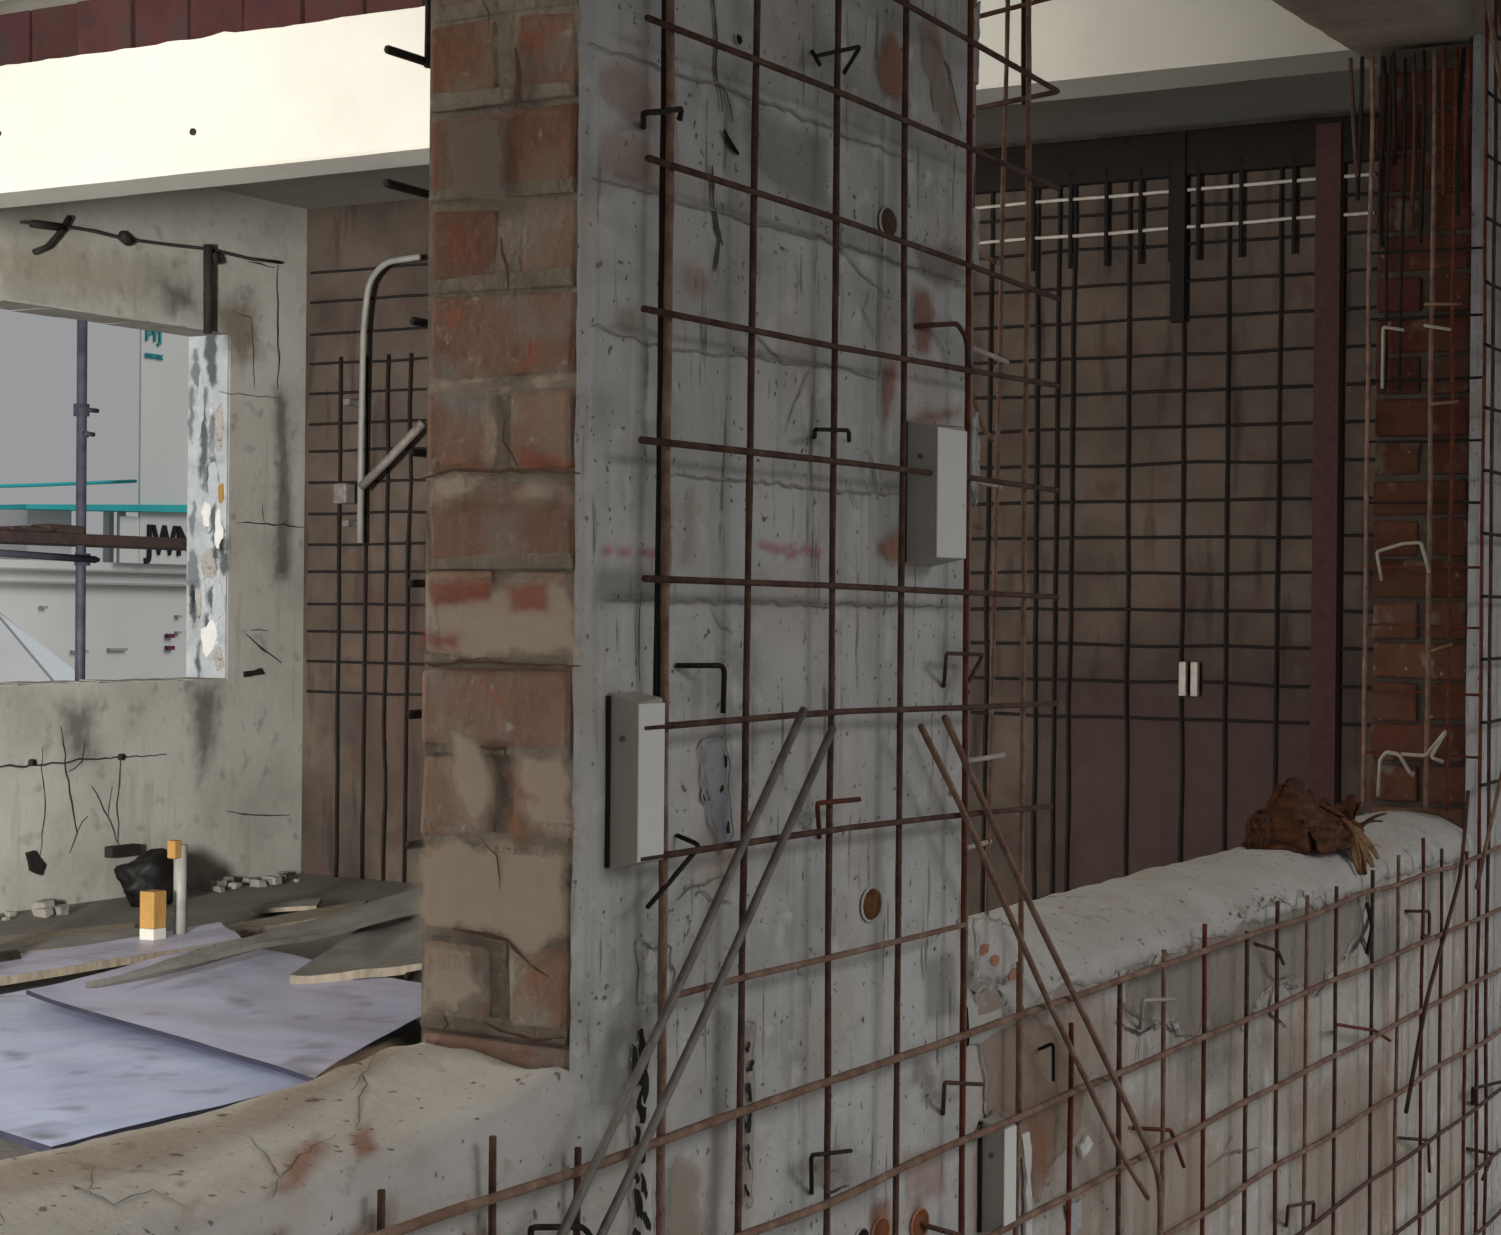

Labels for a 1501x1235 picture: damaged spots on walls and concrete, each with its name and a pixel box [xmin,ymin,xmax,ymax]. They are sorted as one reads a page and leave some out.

spalling [310,263,428,274]
spalling [310,294,428,304]
spalling [310,317,428,336]
crack [590,0,962,506]
crack [0,726,166,854]
peeling [186,334,264,678]
spalling [306,353,428,883]
spalling [355,0,1501,1235]